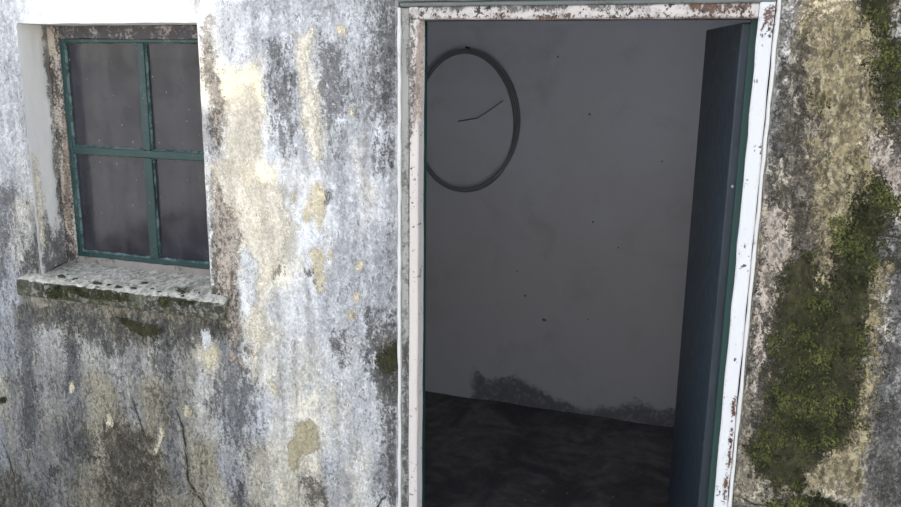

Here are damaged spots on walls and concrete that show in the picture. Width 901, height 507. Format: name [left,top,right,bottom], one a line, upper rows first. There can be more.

corrosion [429,3,653,20]
corrosion [665,2,777,46]
water stain [314,35,352,131]
water stain [363,0,395,173]
water stain [0,25,259,448]
water stain [733,27,901,507]
water stain [74,408,172,507]
crack [131,398,149,447]
crack [174,407,205,507]
water stain [203,344,265,460]
crack [371,493,387,507]
corrosion [722,396,737,504]